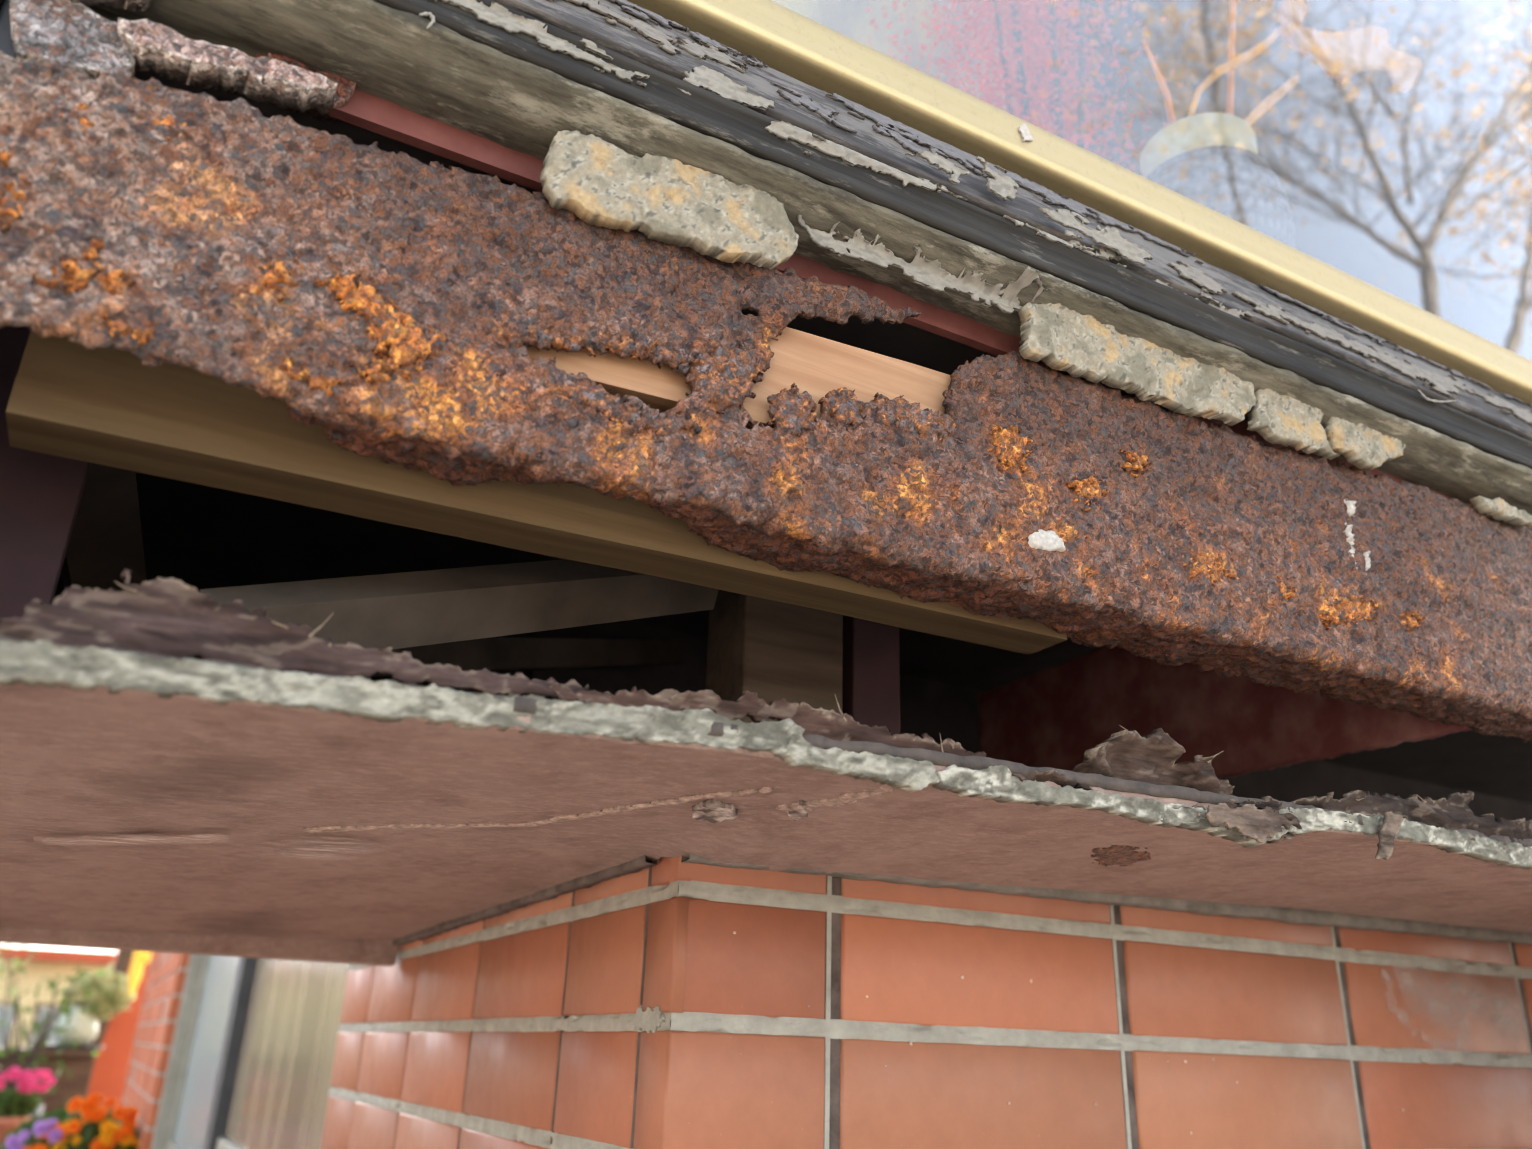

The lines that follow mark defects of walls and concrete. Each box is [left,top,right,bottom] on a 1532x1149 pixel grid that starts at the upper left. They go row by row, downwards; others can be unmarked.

peeling [117,18,338,112]
peeling [419,0,650,88]
rust [31,237,137,299]
peeling [540,0,1532,471]
rust [84,313,158,350]
rust [256,257,447,398]
rust [502,324,957,442]
rust [987,424,1034,473]
rust [1066,475,1109,512]
spalling [1469,496,1532,528]
rust [1319,594,1380,630]
spalling [0,620,1532,870]